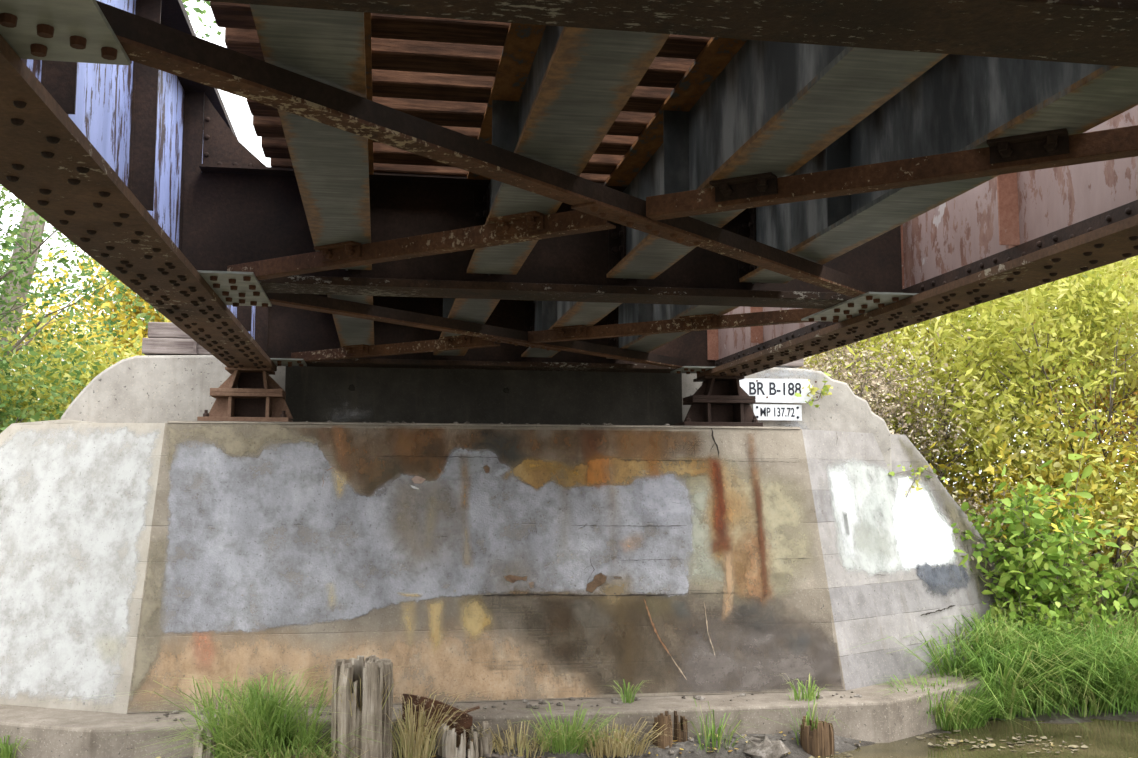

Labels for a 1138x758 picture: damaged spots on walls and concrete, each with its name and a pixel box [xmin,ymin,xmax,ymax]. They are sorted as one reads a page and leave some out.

peeling [161,441,693,633]
corrosion [710,439,771,615]
peeling [829,462,956,574]
water stain [916,491,995,598]